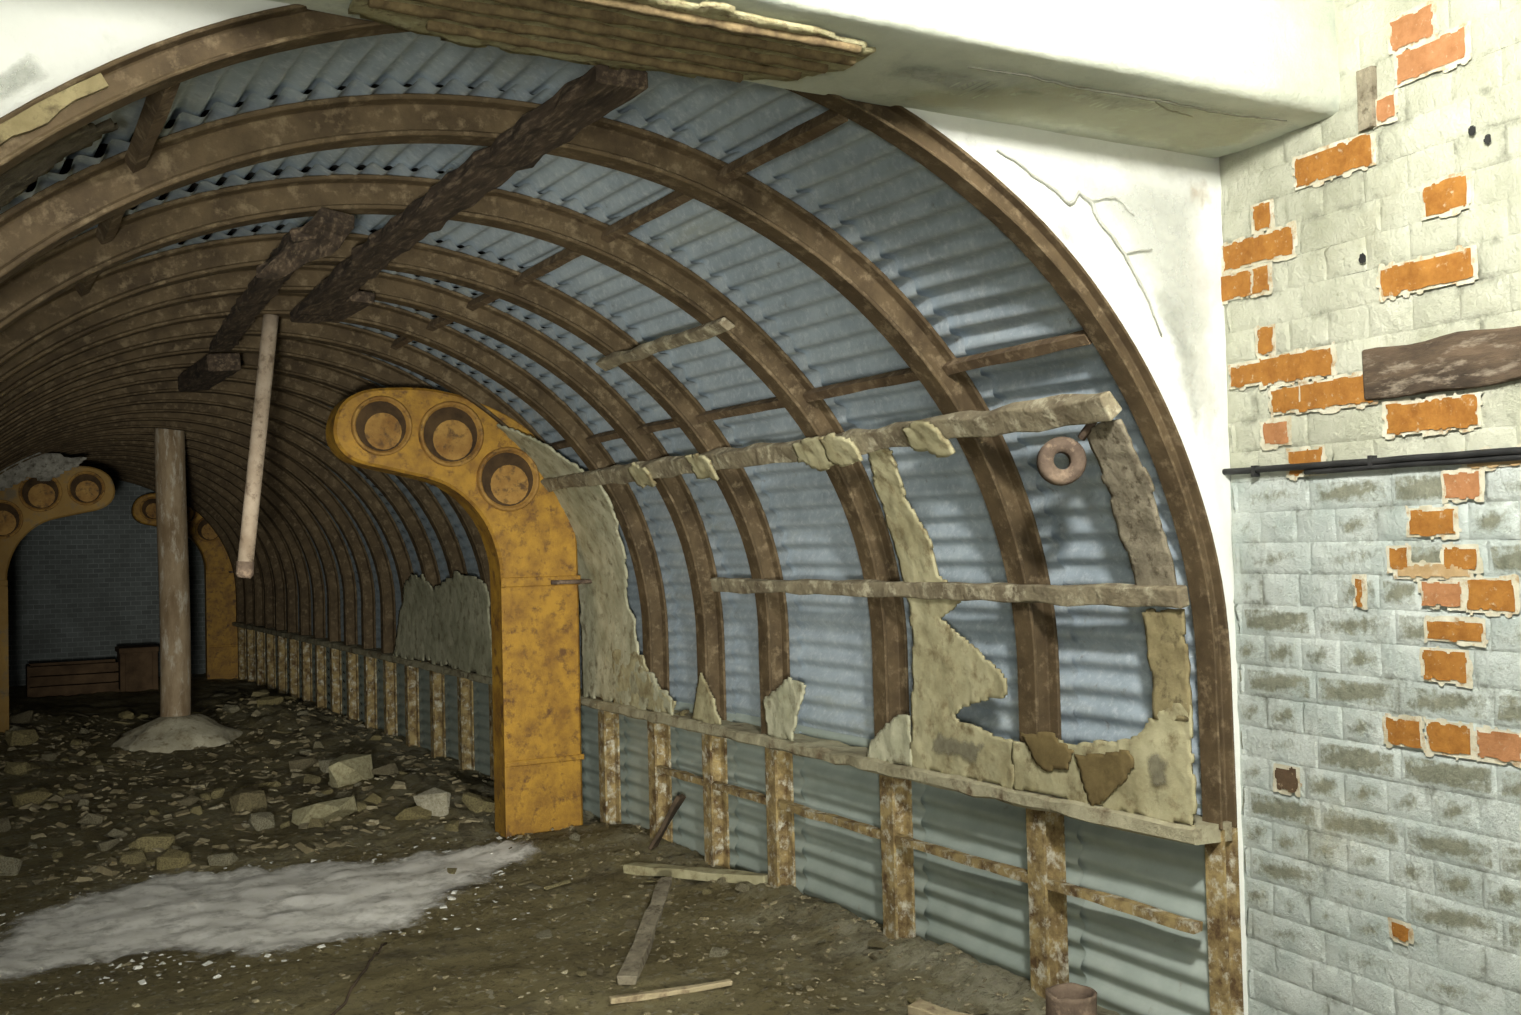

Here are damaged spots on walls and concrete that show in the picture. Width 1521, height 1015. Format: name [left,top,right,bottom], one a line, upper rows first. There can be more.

peeling [1292,0,1472,191]
spalling [1468,125,1491,145]
peeling [1421,168,1472,220]
peeling [1221,199,1298,305]
peeling [1358,245,1479,302]
peeling [0,452,87,491]
peeling [763,677,806,741]
peeling [866,714,912,766]
peeling [1382,713,1521,768]
peeling [1020,732,1134,806]
peeling [1387,917,1414,946]